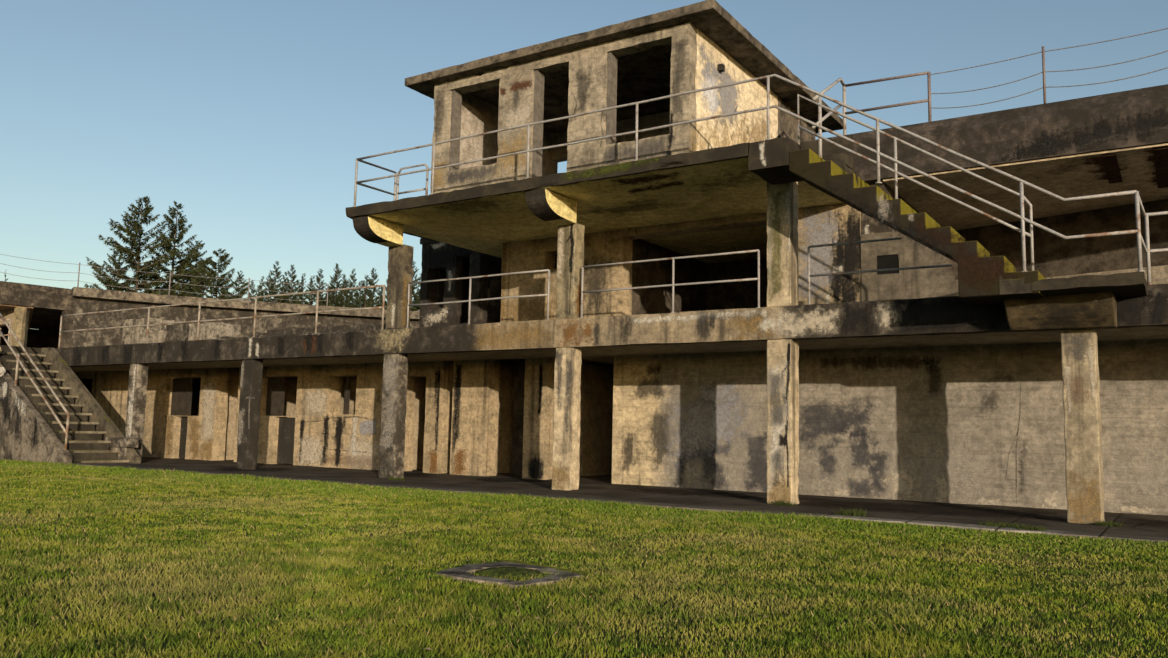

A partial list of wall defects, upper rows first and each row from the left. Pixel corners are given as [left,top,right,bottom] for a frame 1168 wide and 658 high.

damp [821,356,941,392]
damp [320,416,357,466]
damp [624,434,633,469]
damp [652,414,672,463]